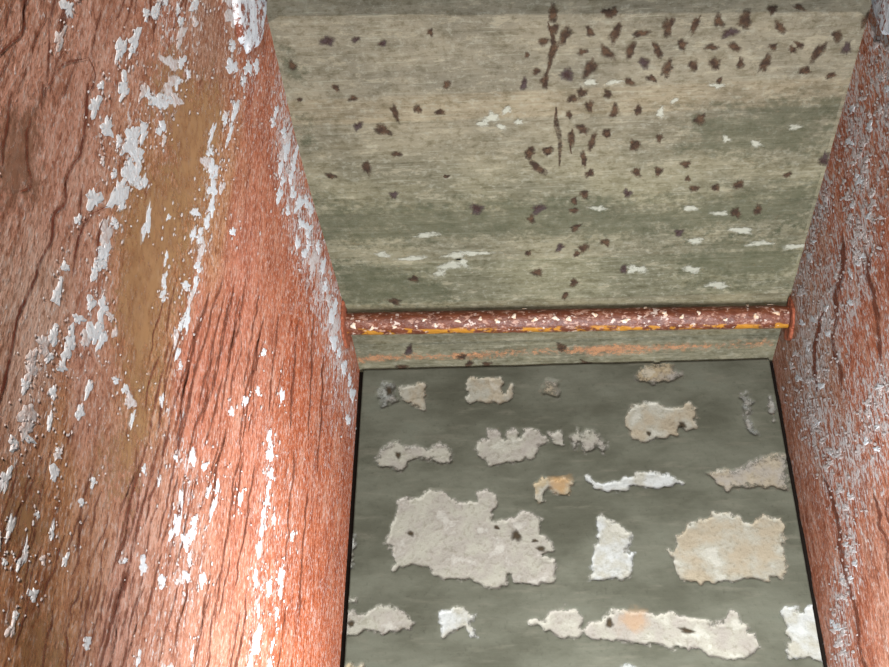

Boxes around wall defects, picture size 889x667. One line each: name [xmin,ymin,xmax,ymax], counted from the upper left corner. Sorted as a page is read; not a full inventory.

rust [0,0,82,196]
rust [0,47,264,667]
peeling [767,40,889,663]
rust [812,241,846,392]
rust [864,250,882,361]
spalling [385,489,557,589]
spalling [590,514,634,581]
spalling [585,470,685,492]
spalling [666,511,788,586]
rust [824,479,867,667]
rust [873,493,889,576]
spalling [527,608,761,660]